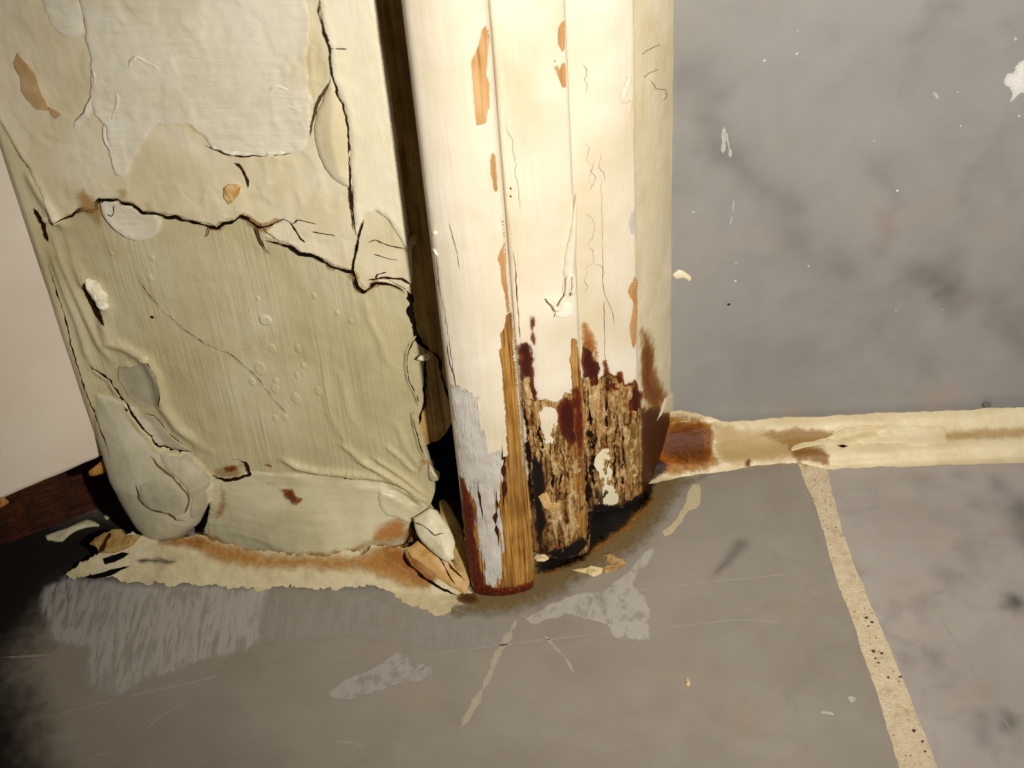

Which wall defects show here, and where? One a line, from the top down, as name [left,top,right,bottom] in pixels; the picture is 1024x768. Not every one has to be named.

peeling [205,145,289,158]
crack [34,4,456,459]
rust [517,317,537,402]
rust [557,323,717,494]
rust [161,518,435,589]
peeling [413,423,534,603]
damp [451,478,693,617]